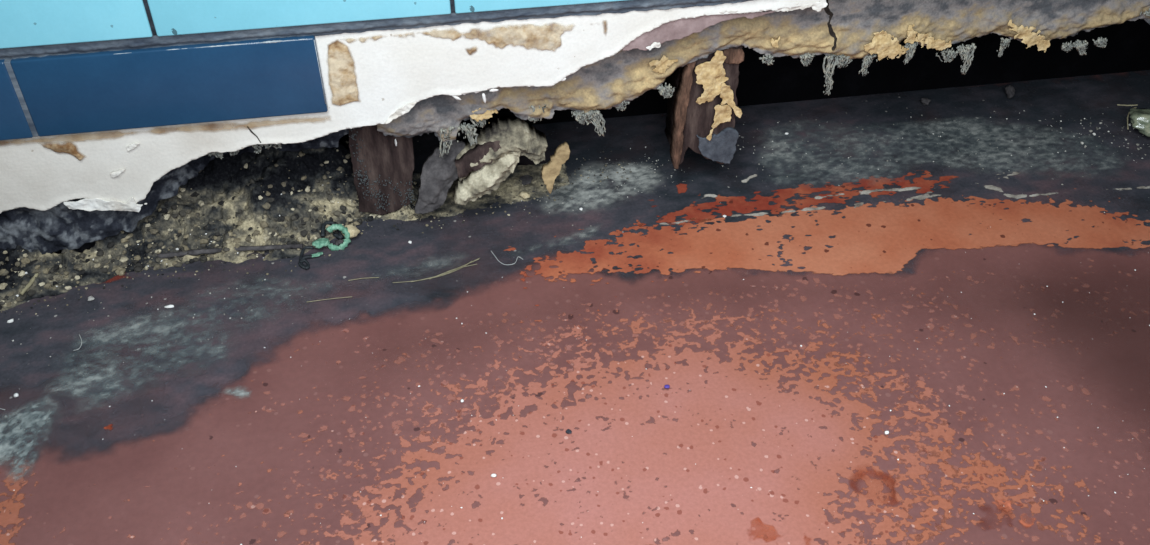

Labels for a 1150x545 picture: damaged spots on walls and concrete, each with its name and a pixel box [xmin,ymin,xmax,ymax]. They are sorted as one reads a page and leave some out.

peeling [328,40,359,106]
spalling [377,0,1150,157]
damp [0,70,1150,479]
peeling [519,170,1150,297]
peeling [296,296,1113,545]